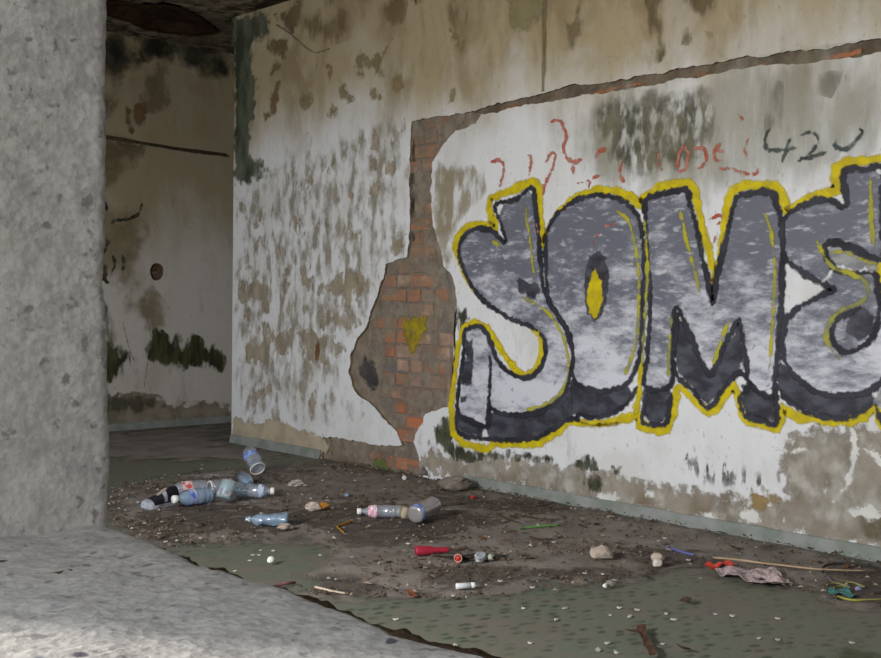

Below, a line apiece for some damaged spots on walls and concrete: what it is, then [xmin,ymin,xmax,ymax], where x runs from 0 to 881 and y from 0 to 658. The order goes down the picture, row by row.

spalling [106,0,219,36]
leakage [384,0,405,23]
leakage [645,0,661,30]
leakage [691,0,713,14]
leakage [356,50,404,91]
leakage [509,0,546,92]
flaking render [824,49,862,60]
leakage [105,0,344,184]
leakage [330,85,354,114]
leakage [103,212,136,278]
spalling [238,113,481,476]
leakage [420,423,881,547]